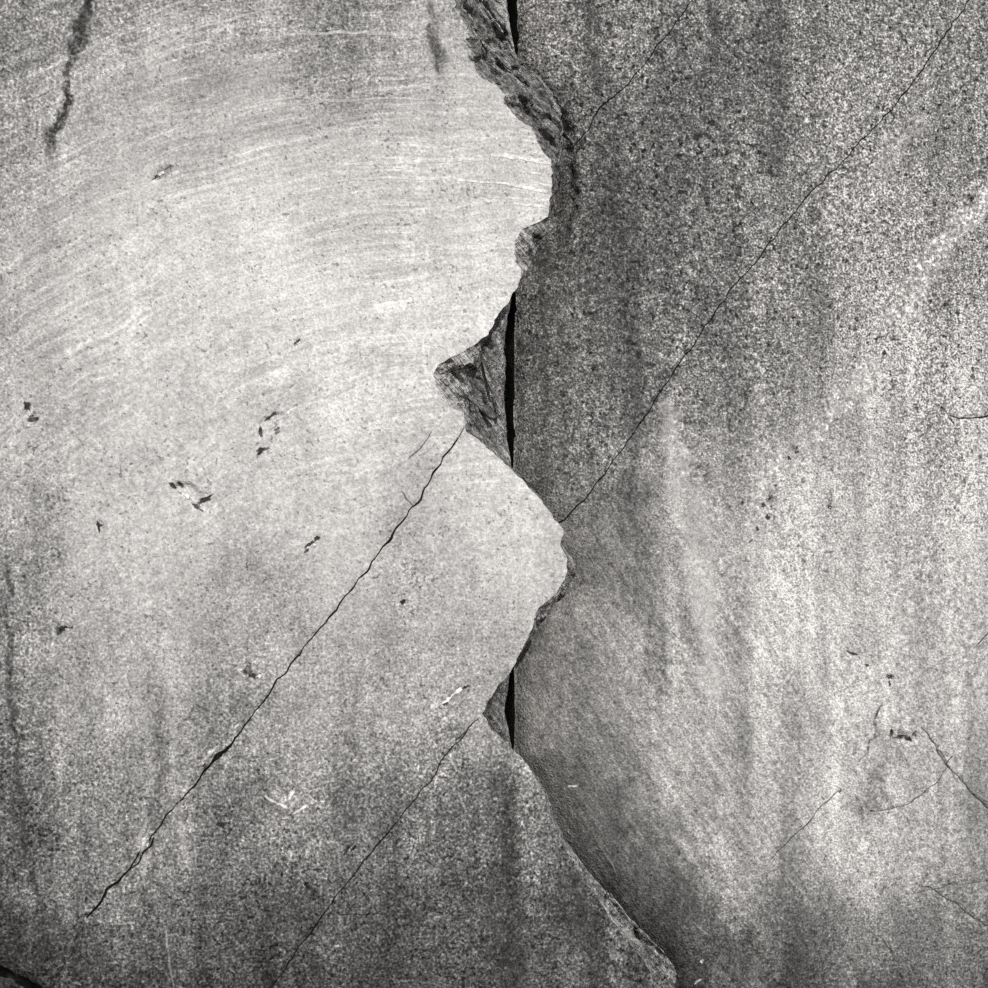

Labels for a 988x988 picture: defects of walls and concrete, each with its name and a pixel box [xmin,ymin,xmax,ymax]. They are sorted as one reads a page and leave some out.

spalling [453,0,563,286]
crack [558,0,969,523]
spalling [433,298,554,519]
crack [939,405,988,423]
crack [86,428,464,918]
spalling [482,539,576,753]
crack [0,964,42,988]
crack [269,718,479,988]
spalling [524,761,701,988]